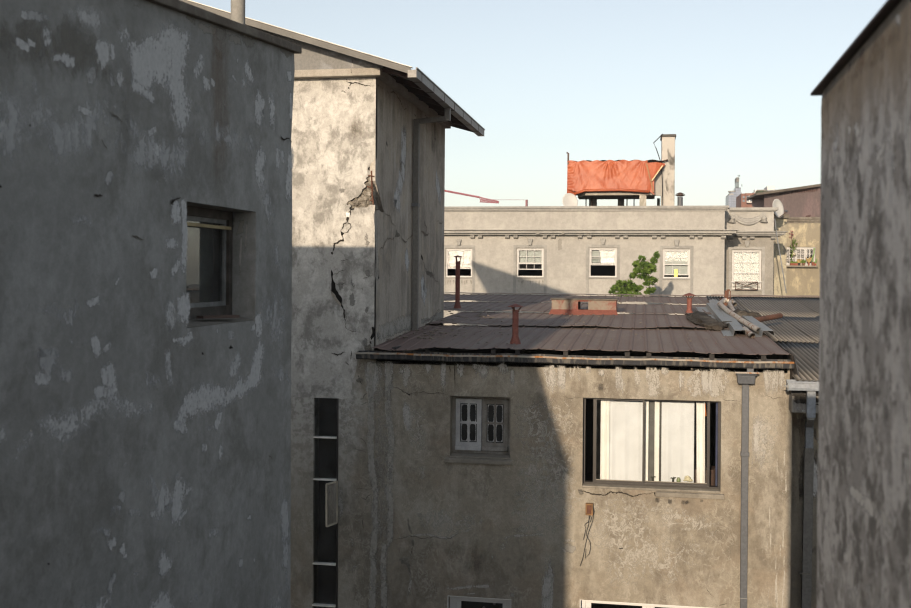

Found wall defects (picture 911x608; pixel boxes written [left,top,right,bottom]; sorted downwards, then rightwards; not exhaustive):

peeling [53,53,75,68]
peeling [95,24,192,134]
spalling [346,168,412,280]
crack [331,210,372,364]
leakage [763,370,785,393]
crack [578,489,655,497]
leakage [752,416,787,493]